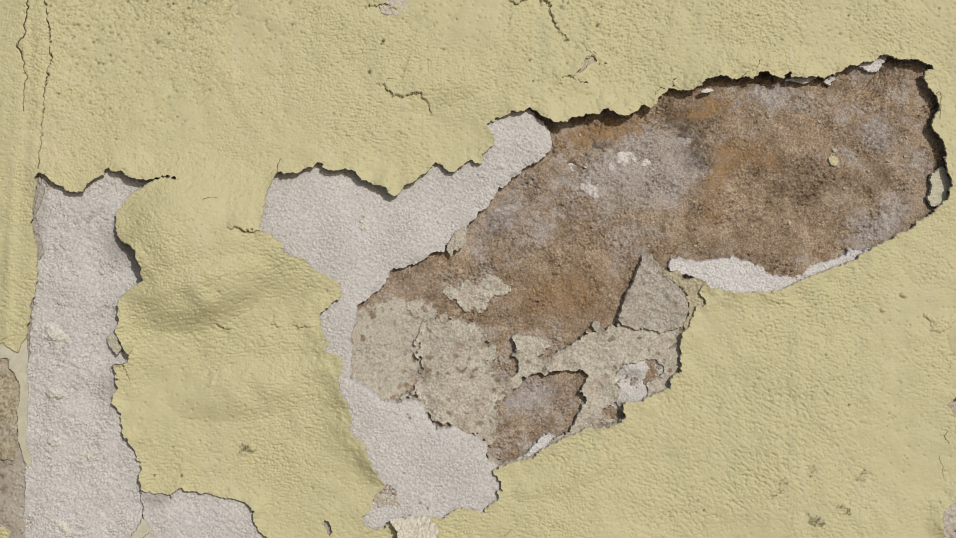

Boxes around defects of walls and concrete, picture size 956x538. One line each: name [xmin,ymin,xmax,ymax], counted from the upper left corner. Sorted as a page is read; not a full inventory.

crack [16,0,52,169]
peeling [0,168,267,538]
spalling [259,54,953,538]